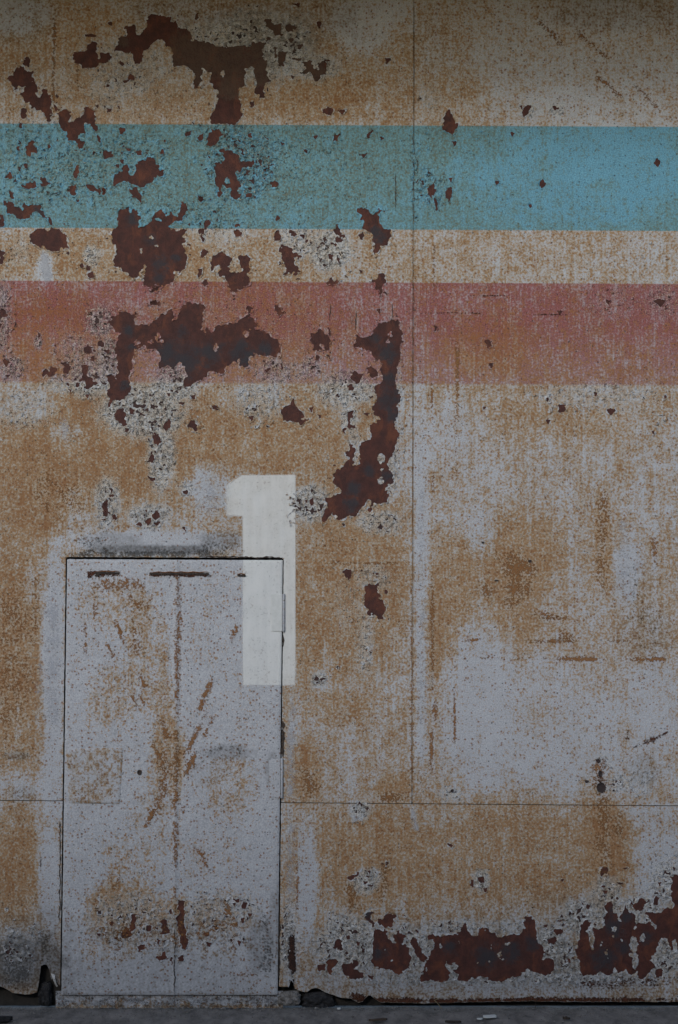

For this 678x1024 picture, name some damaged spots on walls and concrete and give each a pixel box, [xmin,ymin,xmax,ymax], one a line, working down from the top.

peeling [0,8,335,433]
peeling [327,205,394,264]
peeling [304,268,405,527]
corrosion [0,580,38,749]
peeling [342,567,389,621]
corrosion [429,579,438,774]
corrosion [476,550,537,609]
corrosion [514,611,604,662]
corrosion [149,730,188,867]
peeling [96,891,199,965]
corrosion [97,888,236,952]
peeling [316,865,678,987]